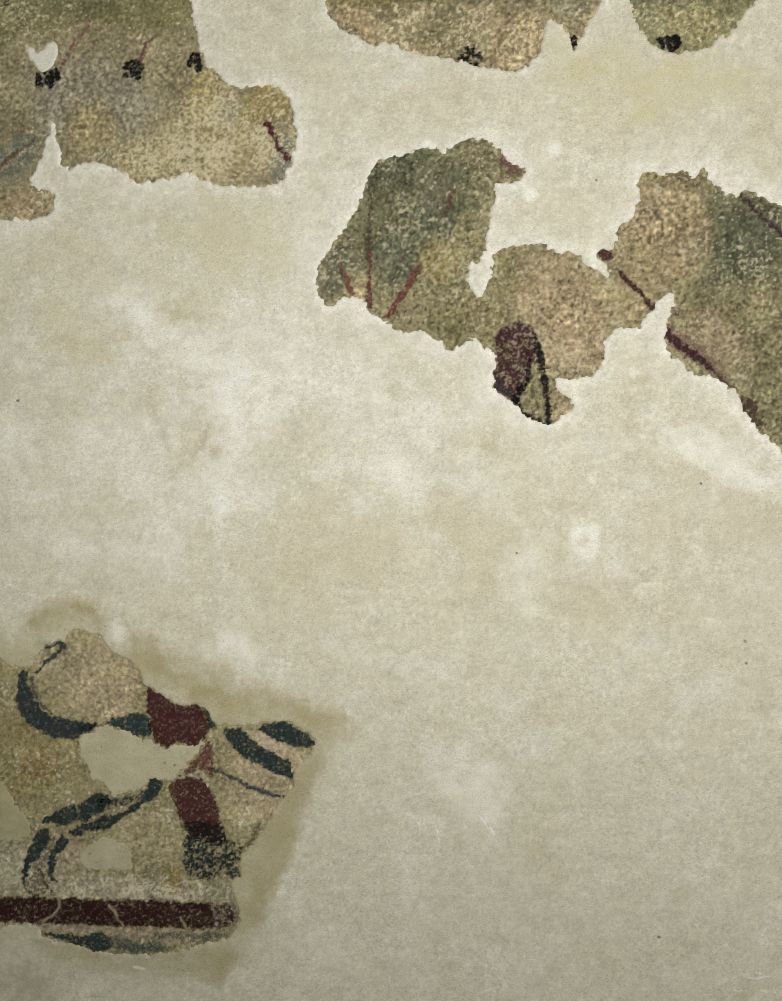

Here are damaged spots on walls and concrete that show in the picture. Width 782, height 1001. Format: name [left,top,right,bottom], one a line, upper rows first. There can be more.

water stain [0,180,554,1001]